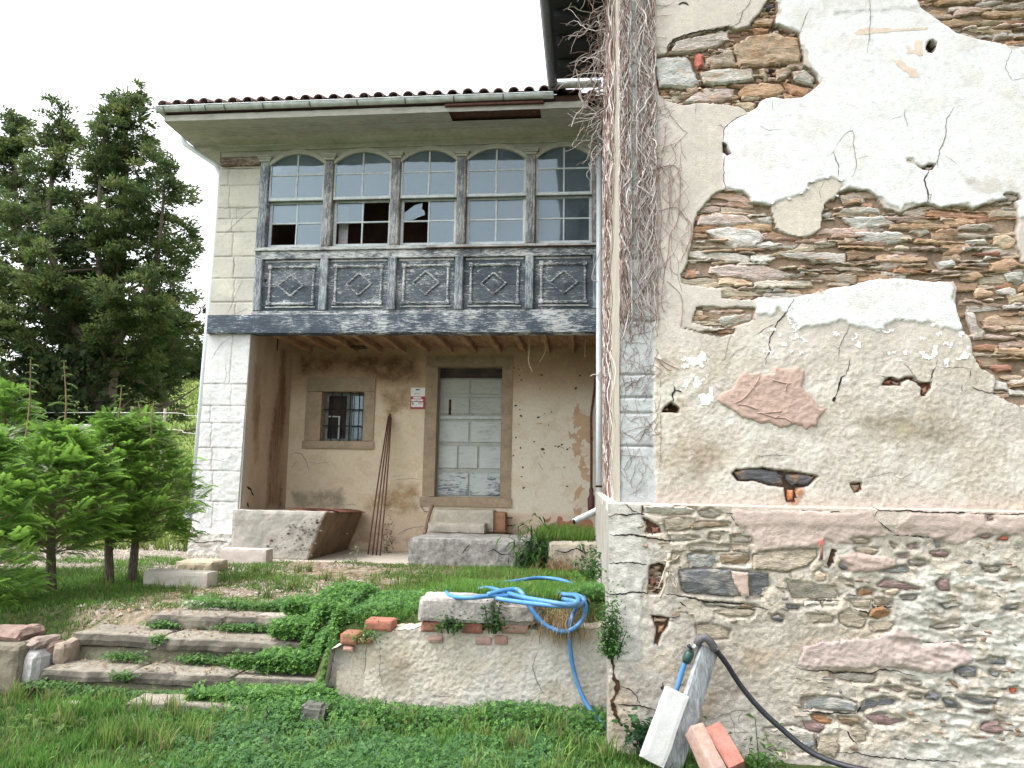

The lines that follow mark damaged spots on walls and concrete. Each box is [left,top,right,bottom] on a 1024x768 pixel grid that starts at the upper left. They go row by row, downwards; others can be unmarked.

spalling [654,0,819,112]
spalling [854,0,1024,77]
crack [910,109,956,203]
spalling [681,177,1024,409]
crack [832,325,851,402]
peeling [533,403,594,529]
crack [609,503,674,542]
spalling [733,468,815,502]
crack [873,507,1024,538]
crack [608,591,768,610]
spalling [637,504,1024,764]
crack [610,641,654,726]